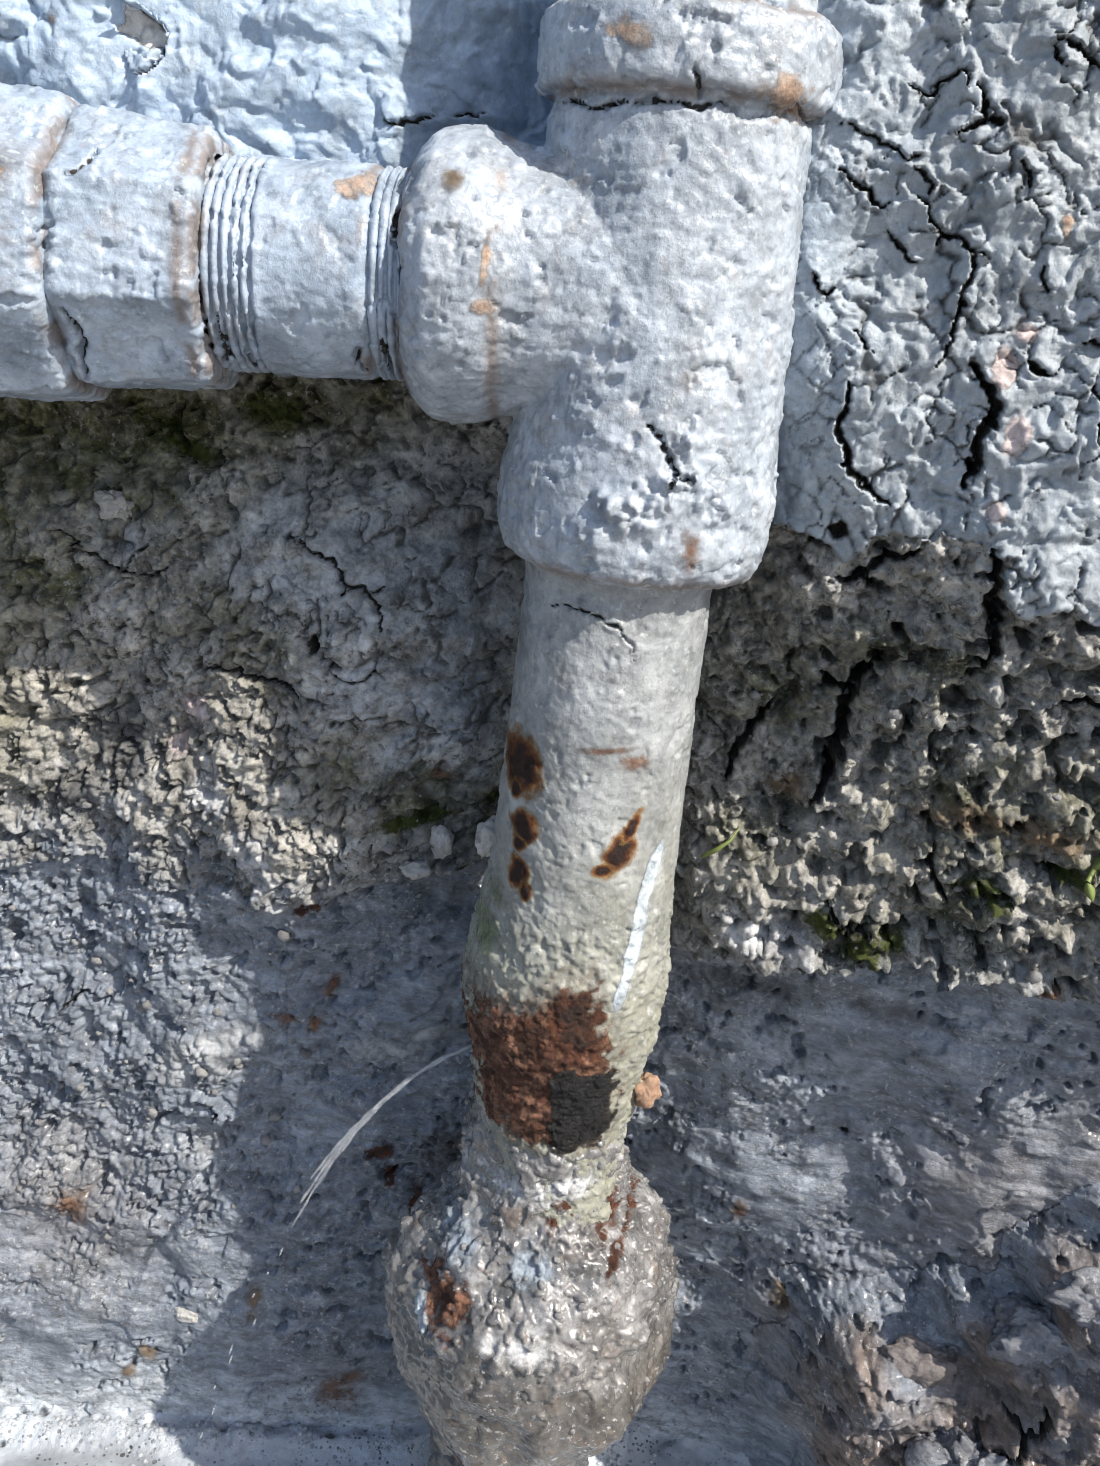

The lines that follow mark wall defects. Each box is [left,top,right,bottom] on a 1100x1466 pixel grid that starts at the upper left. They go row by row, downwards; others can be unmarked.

spalling [118,0,170,75]
crack [908,68,1005,133]
crack [839,122,1003,489]
crack [835,382,890,505]
crack [809,650,883,807]
peeling [180,773,232,827]
peeling [218,828,307,899]
rust [506,725,544,902]
rust [591,808,643,879]
peeling [715,911,819,974]
rust [461,965,623,1147]
rust [419,1253,472,1349]